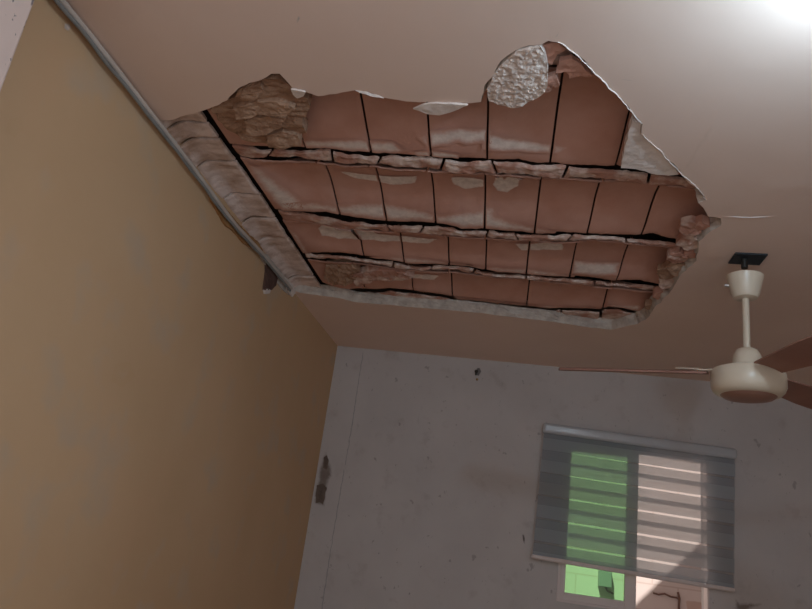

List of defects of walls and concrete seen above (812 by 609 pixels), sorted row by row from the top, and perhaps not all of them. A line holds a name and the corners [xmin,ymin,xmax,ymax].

spalling [160,41,721,330]
peeling [313,451,333,509]